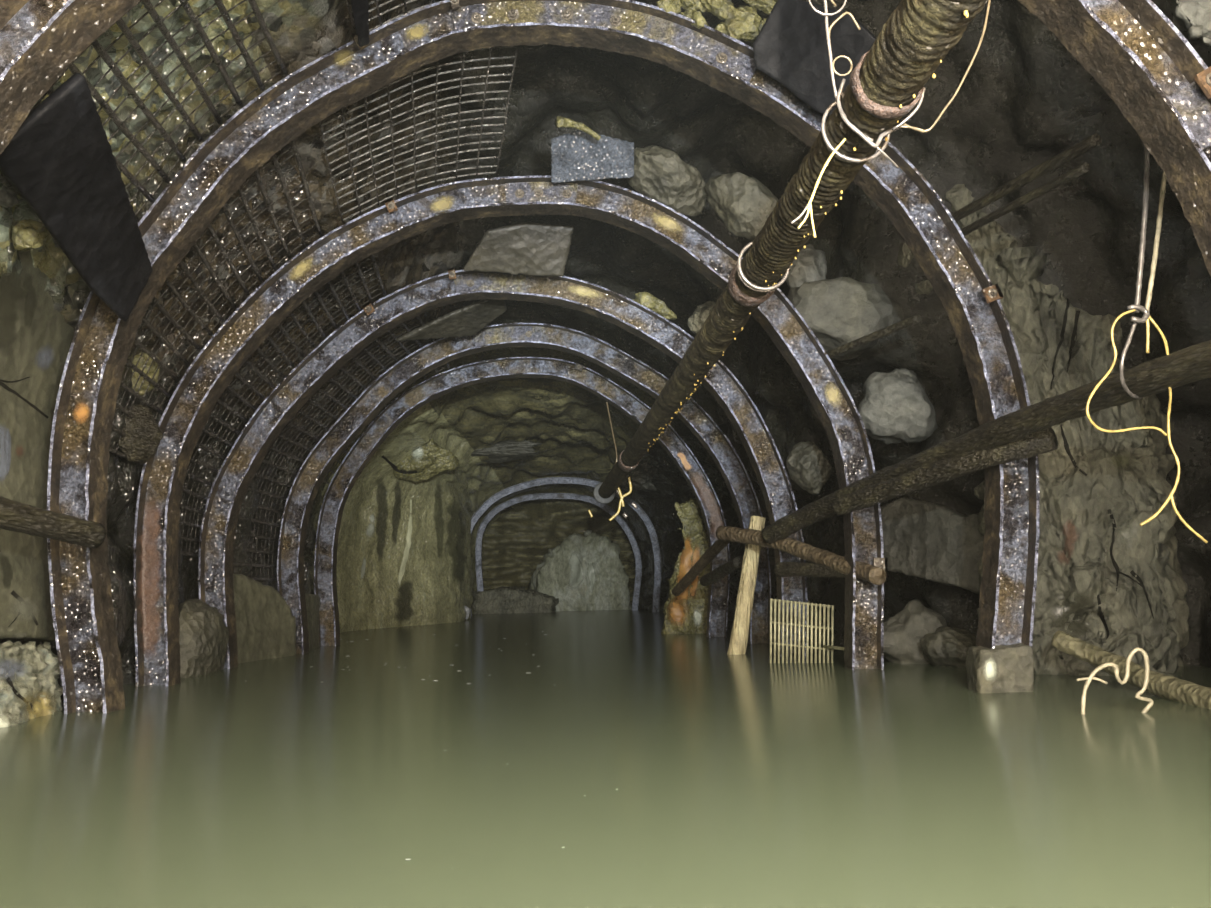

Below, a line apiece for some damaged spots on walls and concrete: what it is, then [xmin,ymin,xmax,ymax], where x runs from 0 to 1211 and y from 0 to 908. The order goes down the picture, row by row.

crack [0,377,48,418]
corrosion [75,405,88,420]